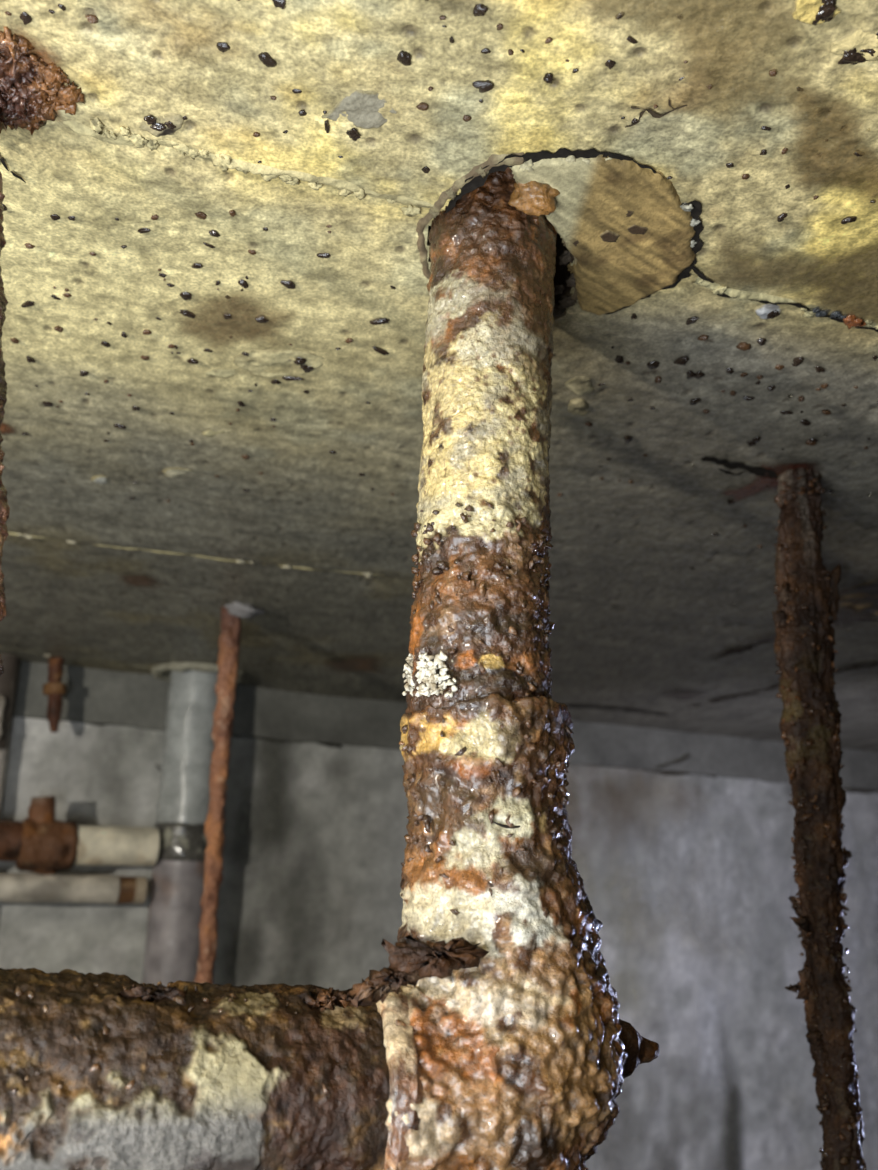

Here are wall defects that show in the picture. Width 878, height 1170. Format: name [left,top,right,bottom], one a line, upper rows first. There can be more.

crack [0,157,26,183]
spalling [553,233,578,320]
corrosion [789,896,809,932]
corrosion [111,983,186,1002]
corrosion [297,935,489,1012]
corrosion [785,963,812,1000]
corrosion [805,1030,824,1047]